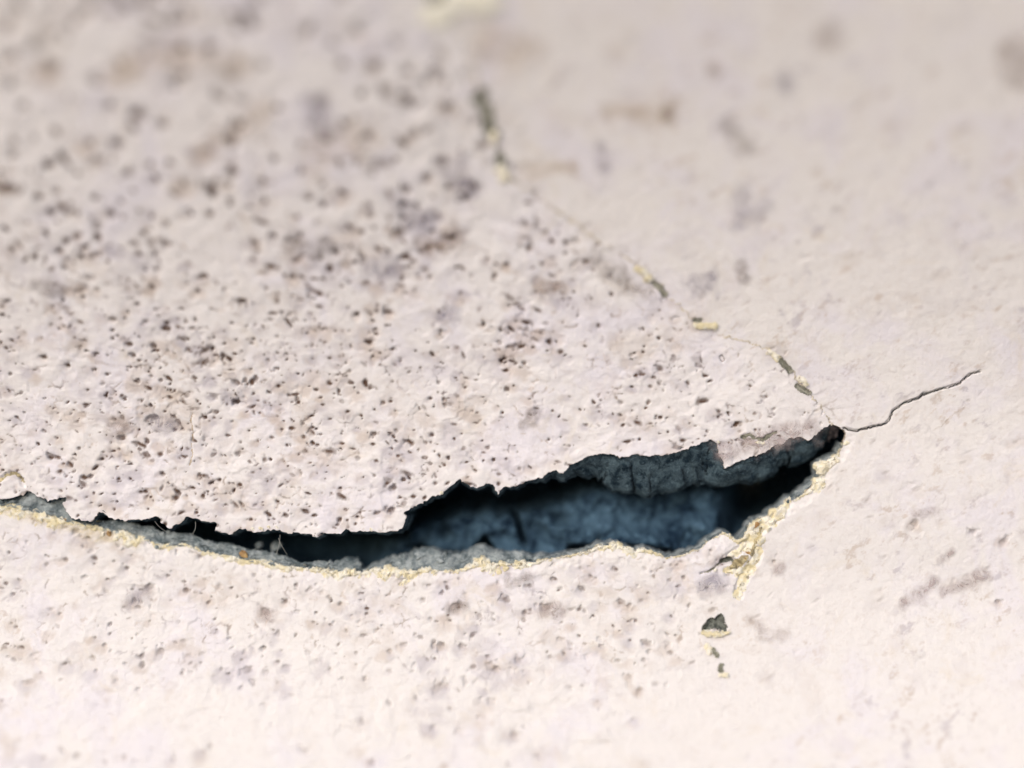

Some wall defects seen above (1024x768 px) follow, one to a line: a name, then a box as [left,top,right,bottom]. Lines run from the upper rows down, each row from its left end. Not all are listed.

peeling [740,431,777,445]
spalling [713,496,792,601]